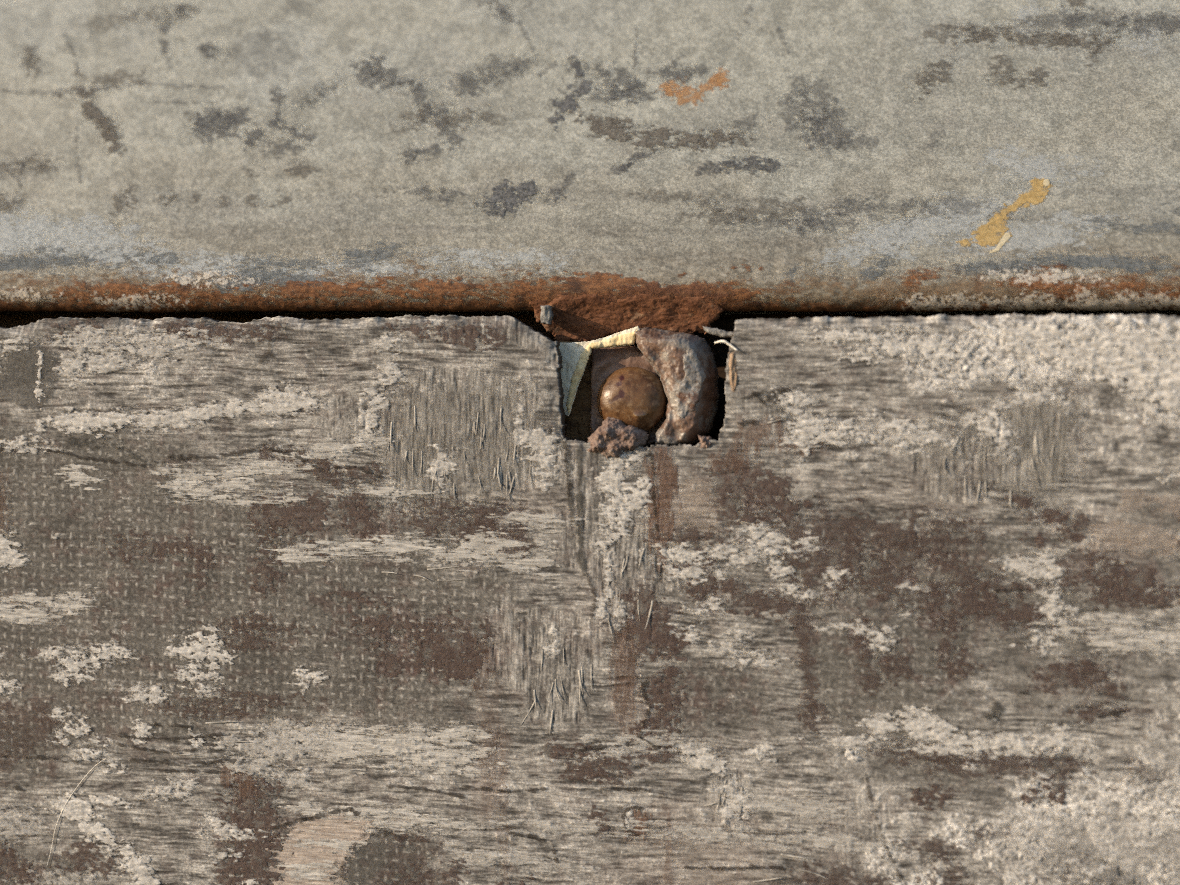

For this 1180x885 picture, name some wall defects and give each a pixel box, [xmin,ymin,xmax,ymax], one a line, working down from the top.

rust [656,68,730,106]
rust [0,258,1180,313]
rust [675,349,706,418]